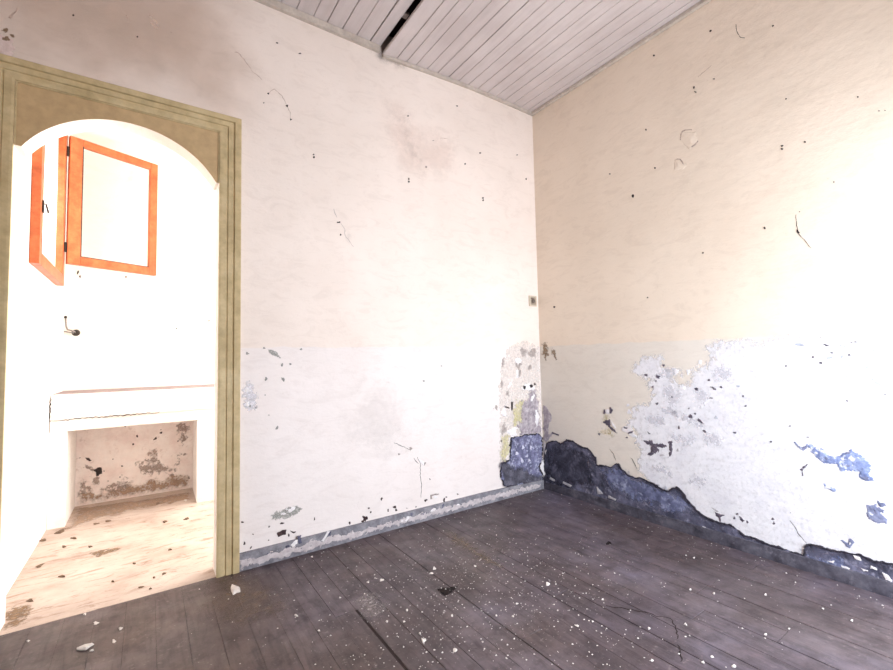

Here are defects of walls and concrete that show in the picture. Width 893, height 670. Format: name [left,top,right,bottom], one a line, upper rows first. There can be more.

leakage [80,449,188,500]
peeling [240,334,893,582]